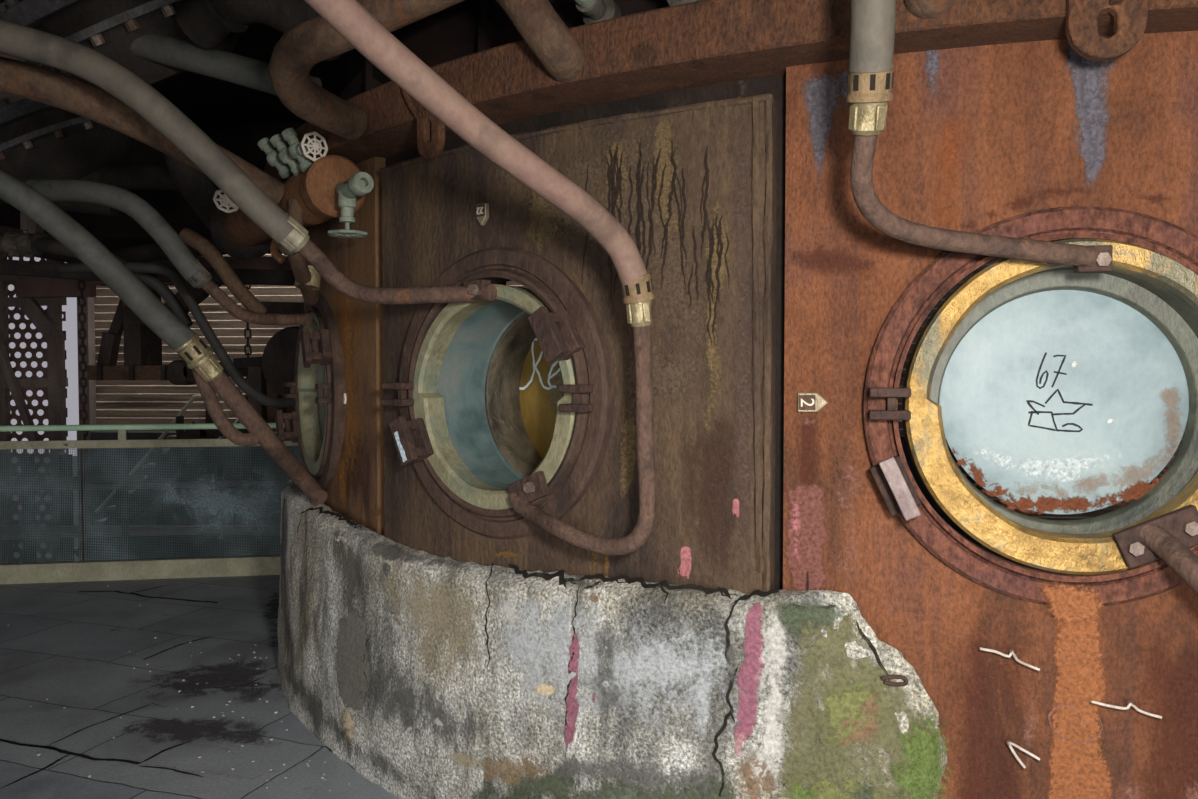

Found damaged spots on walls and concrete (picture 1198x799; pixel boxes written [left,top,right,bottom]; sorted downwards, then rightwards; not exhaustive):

rust [953,447,1166,514]
crack [0,703,278,789]
water stain [124,718,271,744]
water stain [148,498,403,784]
crack [485,562,890,796]
rust [736,758,774,799]
rust [1043,584,1111,799]